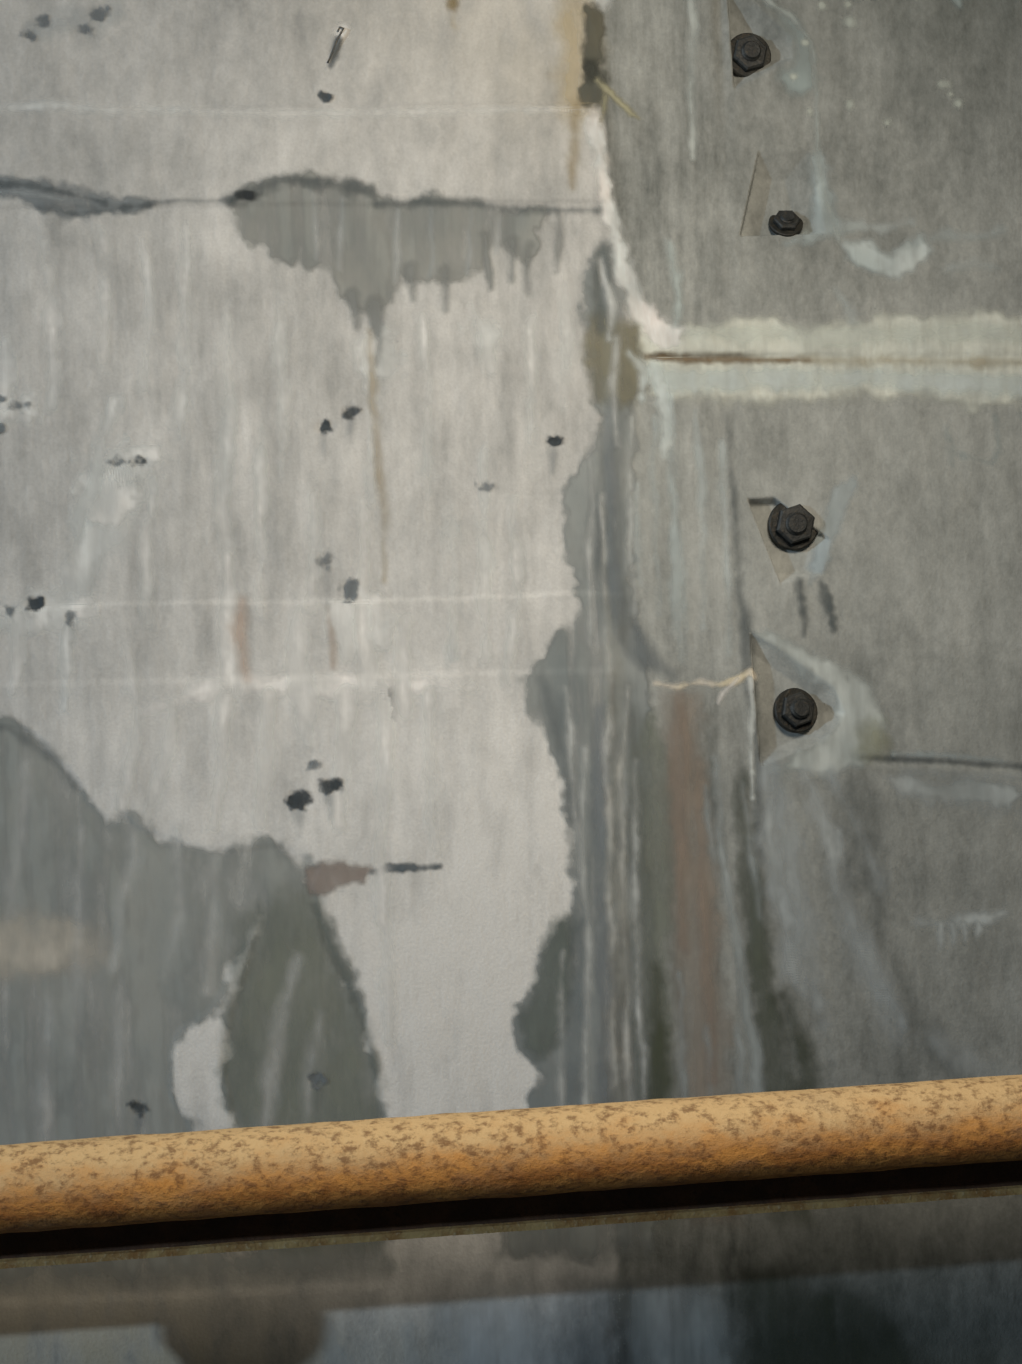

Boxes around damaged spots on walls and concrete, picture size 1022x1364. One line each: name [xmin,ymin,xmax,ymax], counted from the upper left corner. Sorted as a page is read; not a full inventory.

damp [0,177,152,217]
damp [227,171,545,381]
damp [0,306,58,422]
damp [0,440,160,710]
spalling [286,760,342,810]
spalling [129,1102,147,1117]